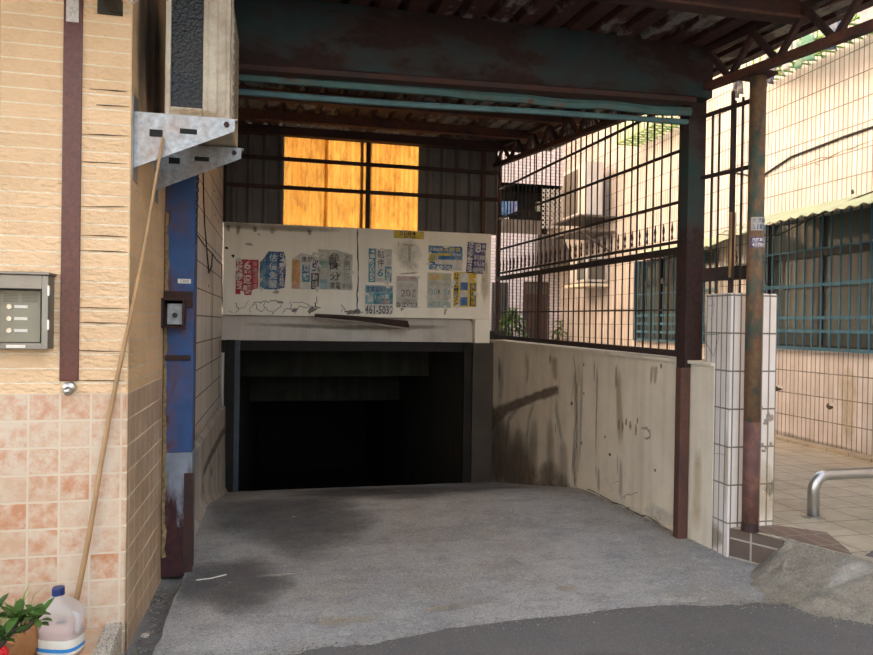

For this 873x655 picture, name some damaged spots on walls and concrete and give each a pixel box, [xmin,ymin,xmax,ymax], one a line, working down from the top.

crack [95,89,127,107]
crack [84,235,125,252]
crack [230,227,359,315]
crack [79,307,127,324]
damp [492,386,558,427]